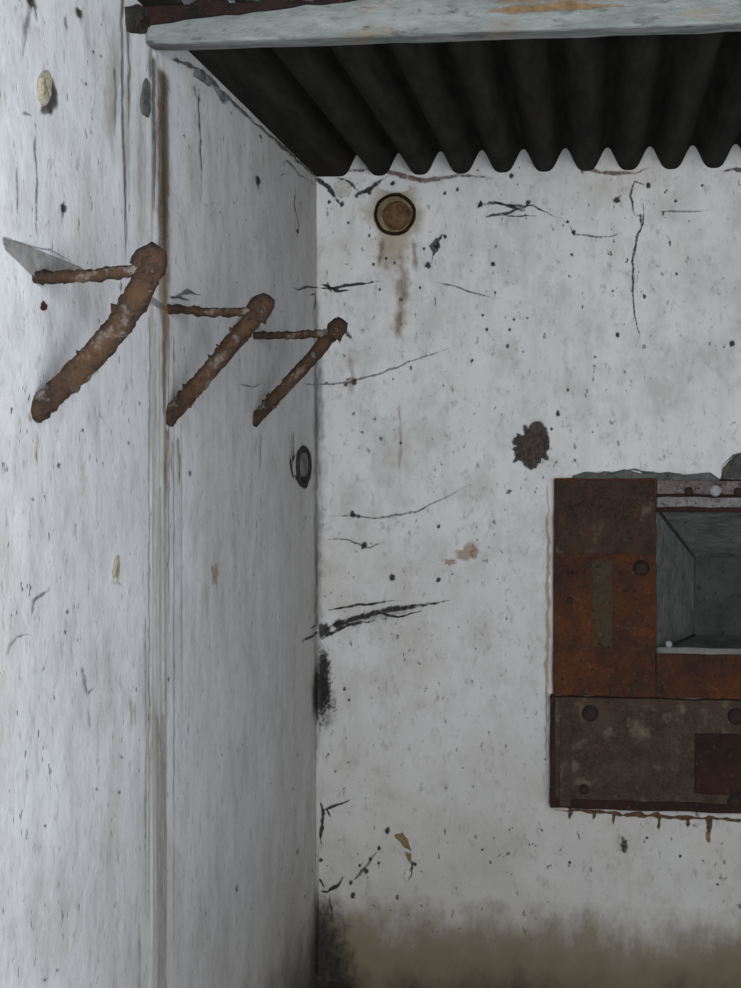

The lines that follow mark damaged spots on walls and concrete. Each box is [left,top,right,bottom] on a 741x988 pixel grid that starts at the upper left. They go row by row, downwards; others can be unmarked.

leakage [4,237,82,276]
crack [478,181,699,341]
spalling [572,453,741,481]
crack [302,600,444,642]
leakage [313,650,334,726]
crack [319,800,349,918]
corrosion [562,808,741,843]
leakage [289,907,741,988]